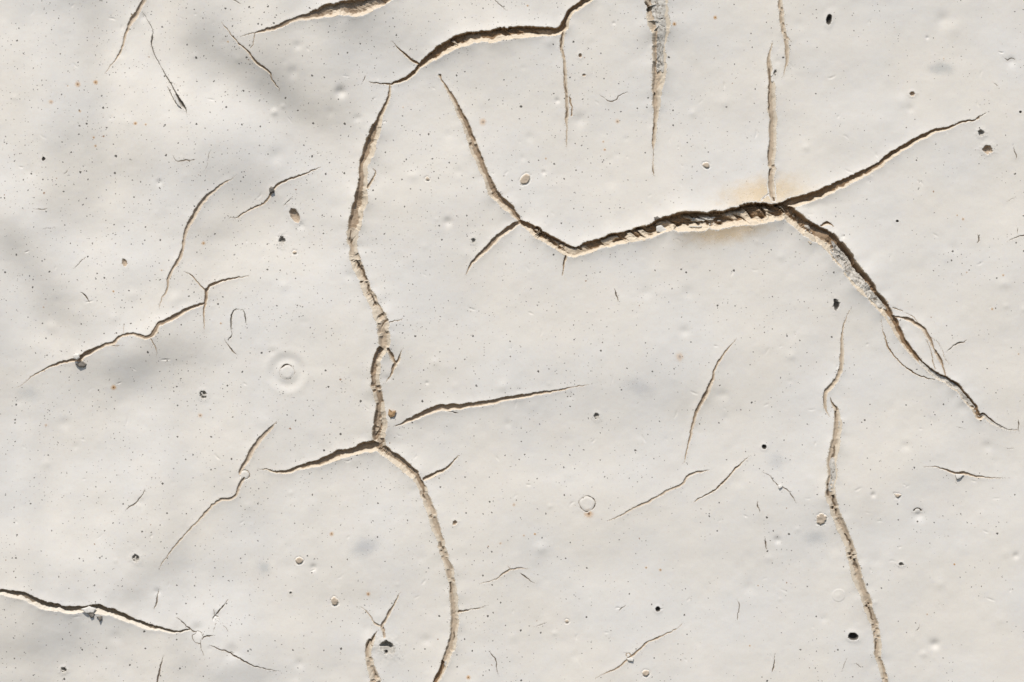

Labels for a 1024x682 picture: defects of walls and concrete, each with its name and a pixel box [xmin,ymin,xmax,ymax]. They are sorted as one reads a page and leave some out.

crack [102,0,190,119]
crack [14,165,323,390]
crack [157,0,597,682]
crack [603,336,799,555]
crack [436,0,1024,435]
crack [821,305,891,682]
crack [0,584,283,674]
crack [154,653,166,682]